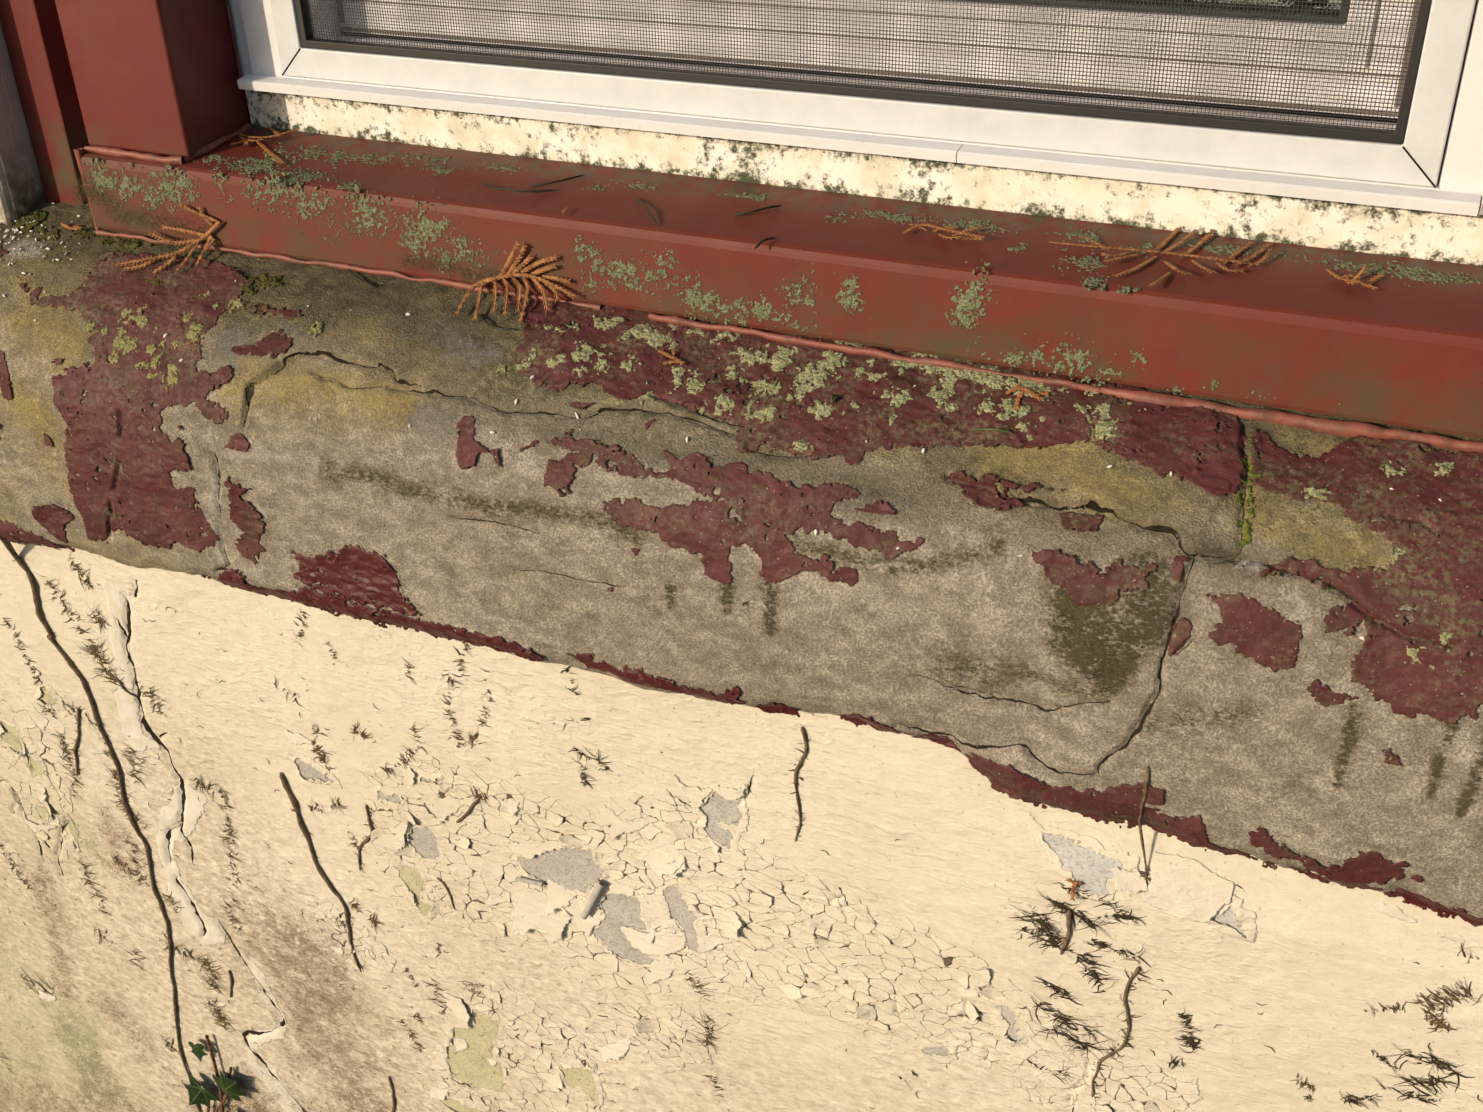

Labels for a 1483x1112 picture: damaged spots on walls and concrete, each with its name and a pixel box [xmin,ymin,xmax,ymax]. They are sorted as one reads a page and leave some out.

peeling [0,249,545,662]
crack [449,516,539,534]
crack [517,569,627,587]
peeling [502,294,1483,725]
crack [900,425,1382,776]
crack [0,727,69,876]
peeling [38,990,56,1002]
crack [118,580,307,1112]
peeling [284,730,1203,1112]
peeling [840,714,1483,943]